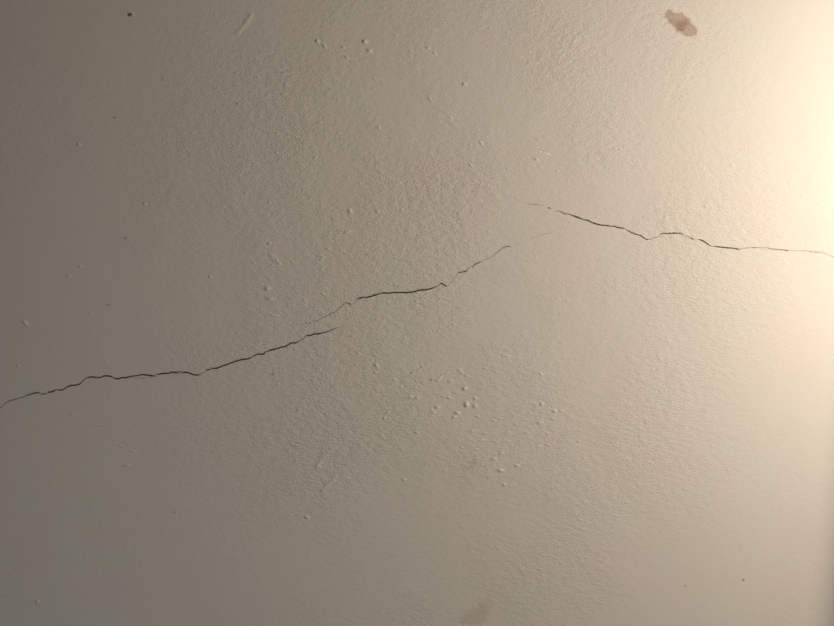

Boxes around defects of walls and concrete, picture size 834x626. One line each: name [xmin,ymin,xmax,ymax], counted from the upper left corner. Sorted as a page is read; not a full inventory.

crack [562,212,739,250]
crack [346,263,479,306]
crack [8,329,333,402]